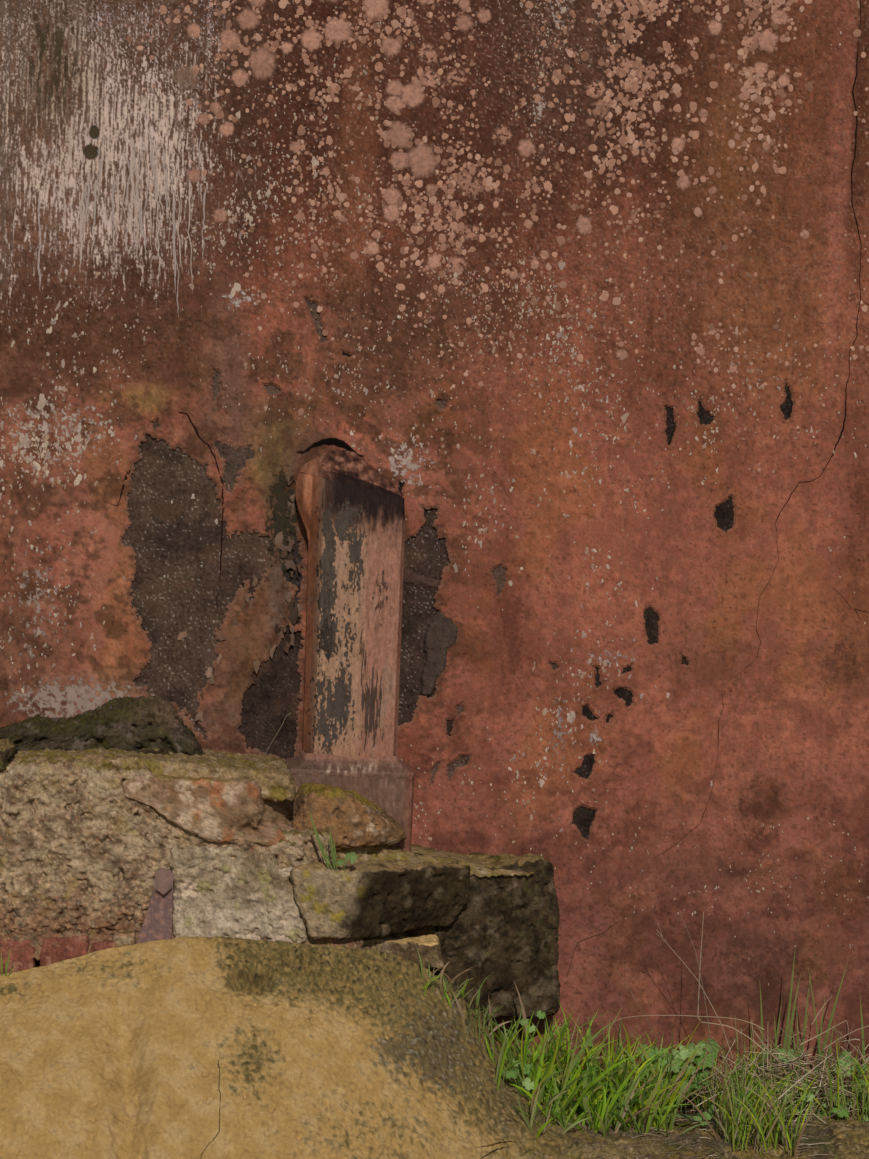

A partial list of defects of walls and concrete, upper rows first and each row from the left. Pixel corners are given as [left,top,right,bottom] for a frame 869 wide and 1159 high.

damp [0,0,235,317]
spalling [659,396,720,451]
crack [658,0,869,856]
spalling [775,375,798,425]
spalling [710,491,739,540]
spalling [115,415,475,786]
spalling [639,603,664,649]
spalling [576,659,638,731]
spalling [567,750,599,784]